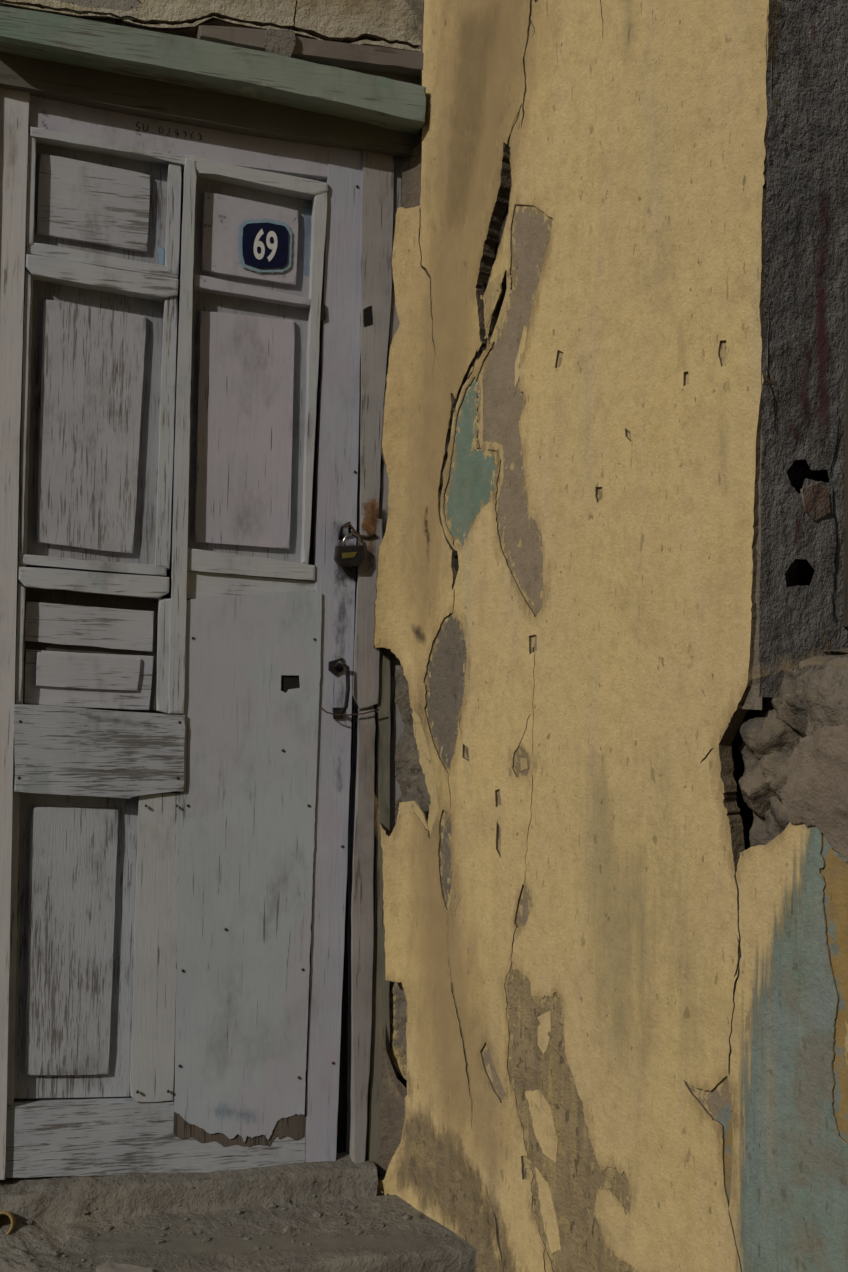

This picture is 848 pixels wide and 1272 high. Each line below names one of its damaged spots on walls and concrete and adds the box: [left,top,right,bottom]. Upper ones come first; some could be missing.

crack [103,16,219,31]
crack [290,6,395,44]
water stain [421,0,520,579]
crack [449,197,510,439]
spalling [440,205,553,616]
crack [451,546,459,573]
spalling [392,614,469,912]
water stain [426,829,478,1109]
peeling [821,834,848,1142]
water stain [397,1112,515,1272]